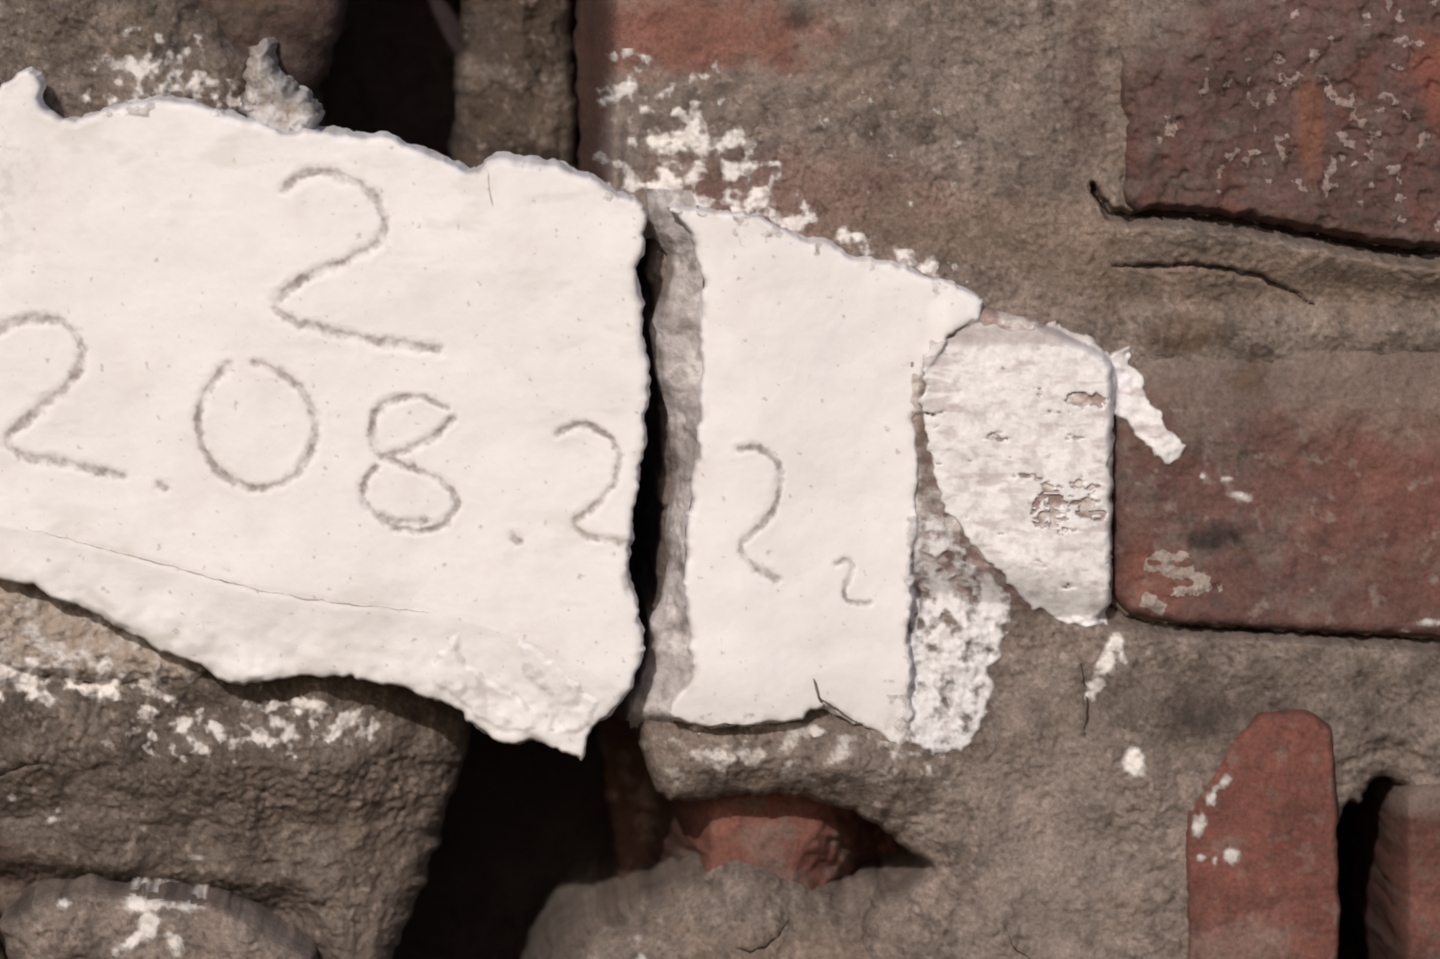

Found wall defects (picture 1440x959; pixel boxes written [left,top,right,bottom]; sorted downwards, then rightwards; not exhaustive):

crack [1087,184,1440,260]
crack [1111,263,1315,305]
crack [587,189,703,738]
flaking render [903,319,1186,754]
spalling [1139,549,1223,615]